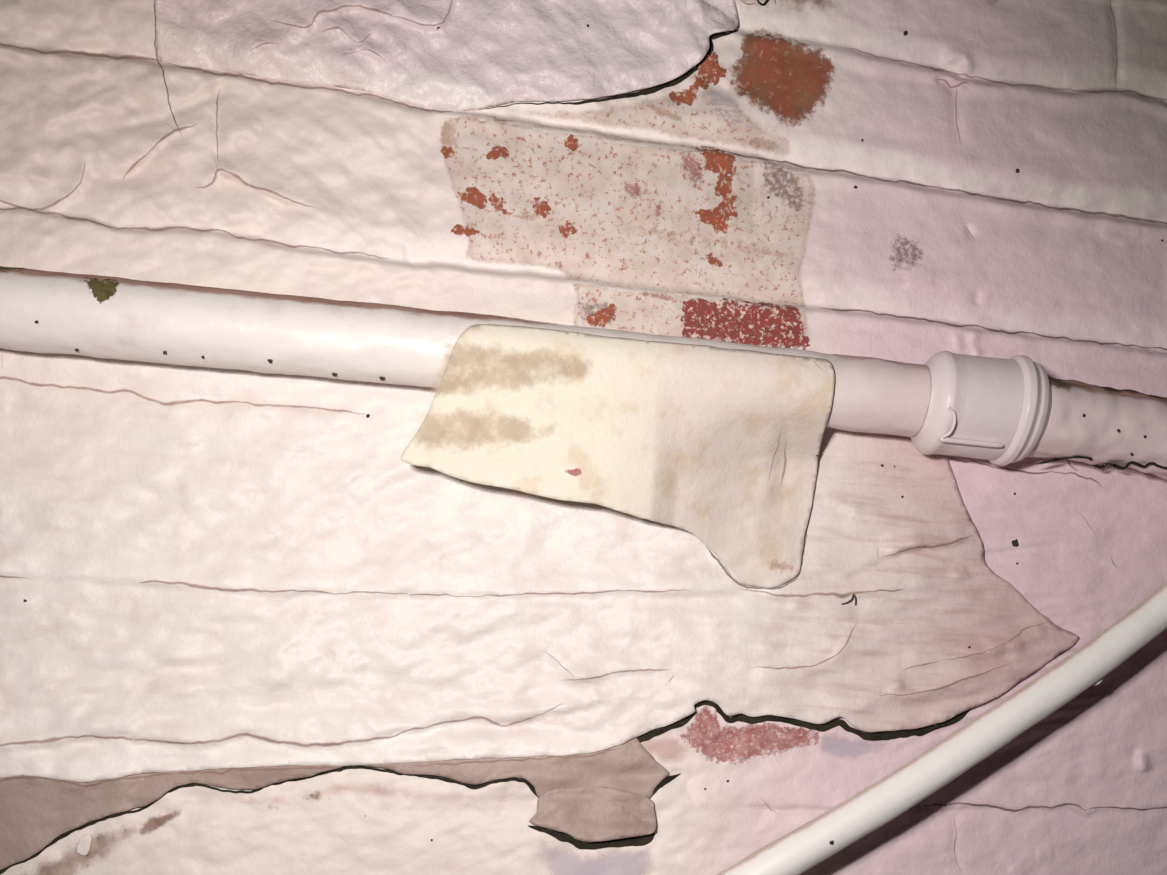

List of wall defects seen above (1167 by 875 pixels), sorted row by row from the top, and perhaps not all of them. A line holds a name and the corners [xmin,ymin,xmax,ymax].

crack [3,5,439,203]
spalling [154,0,814,350]
spalling [731,31,833,125]
peeling [0,324,1079,870]